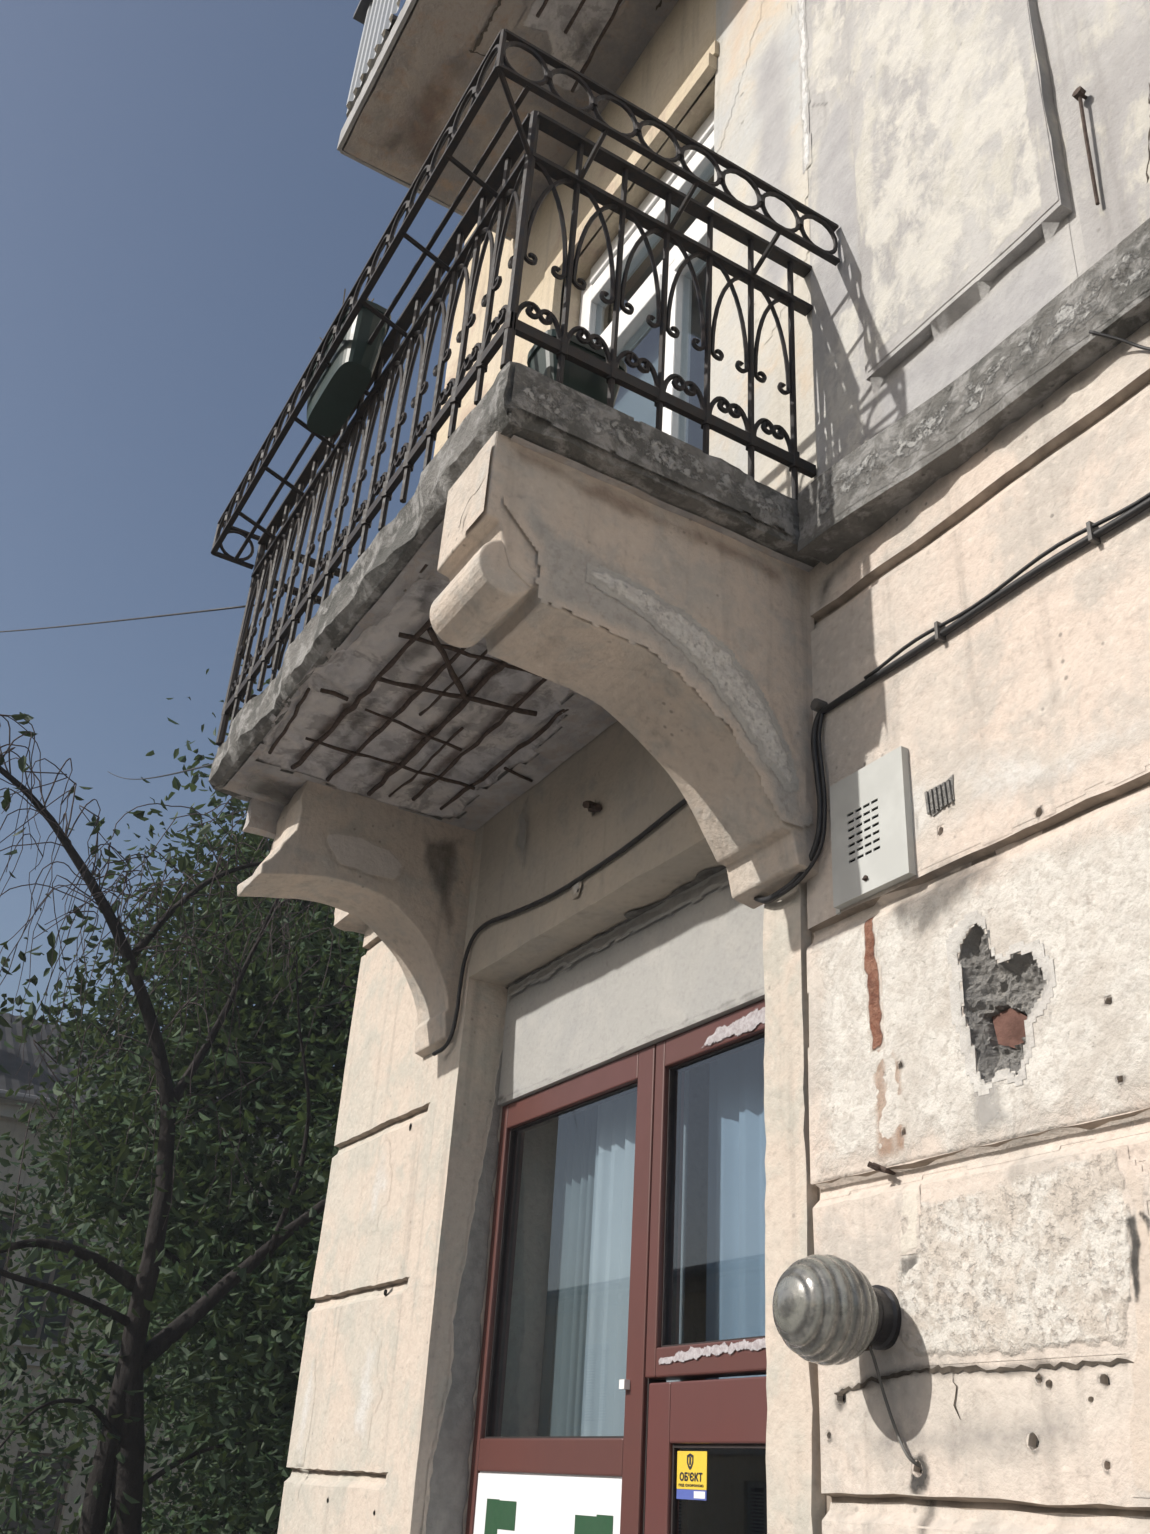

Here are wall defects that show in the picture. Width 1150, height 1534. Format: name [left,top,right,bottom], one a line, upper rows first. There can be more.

peeling [462,442,492,535]
spalling [257,564,573,818]
peeling [504,495,1150,1378]